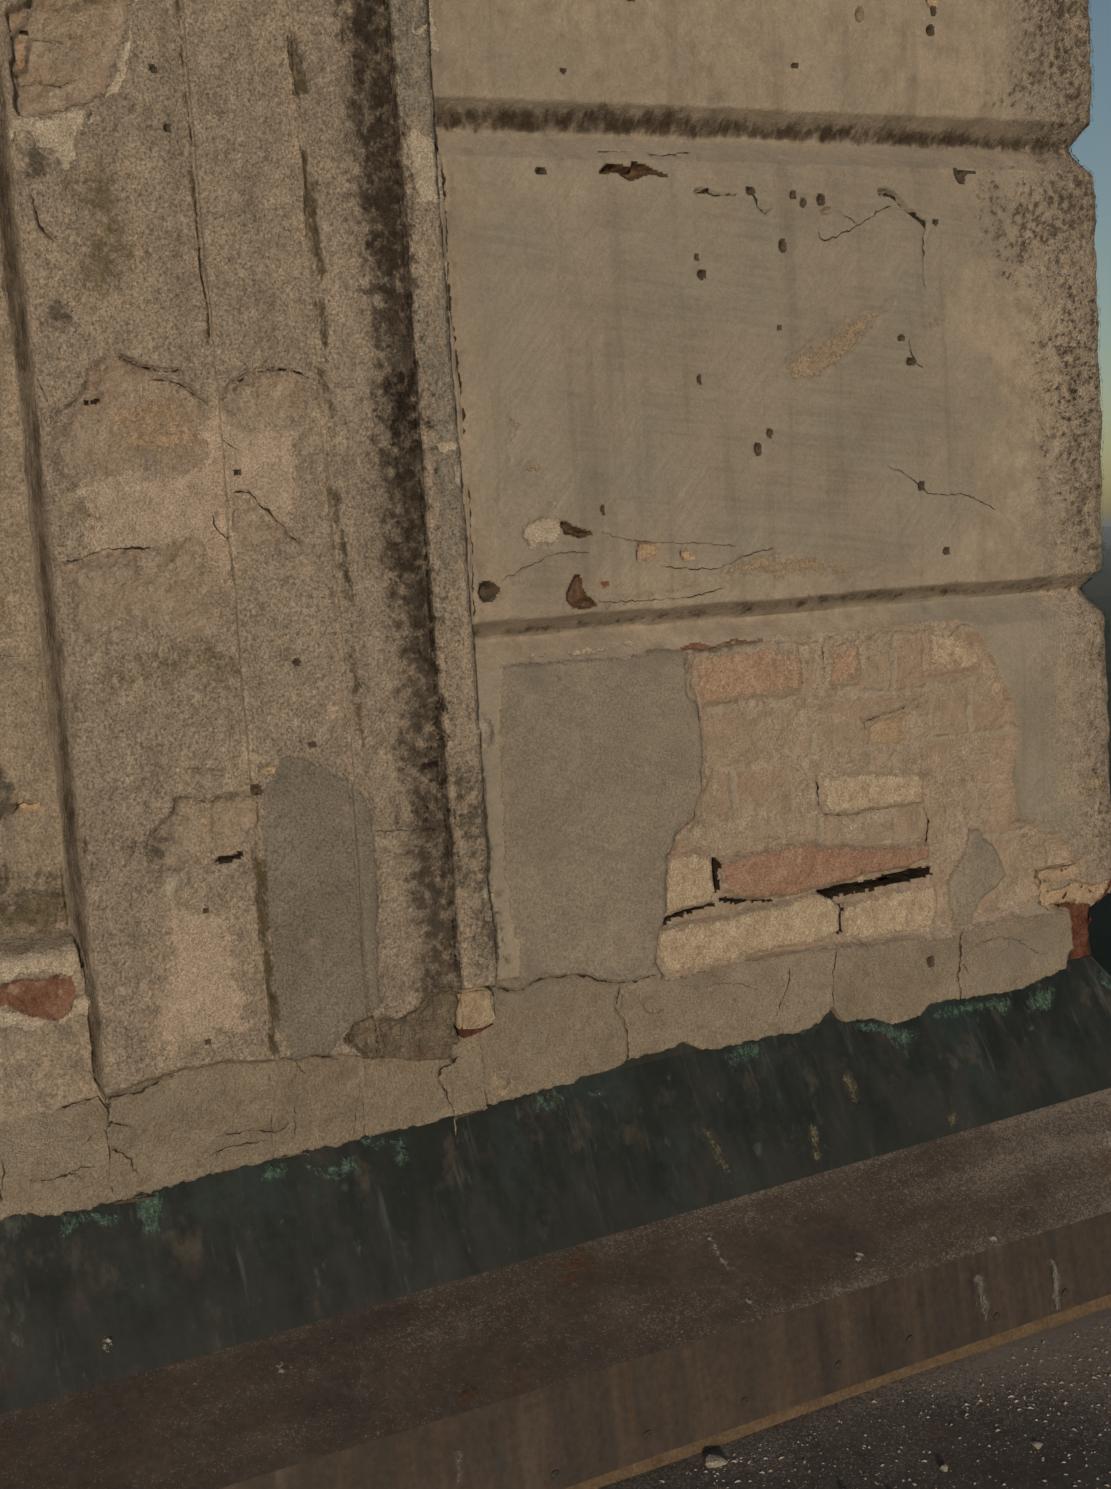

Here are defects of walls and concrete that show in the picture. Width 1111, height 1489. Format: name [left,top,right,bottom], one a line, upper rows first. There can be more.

spalling [2,0,142,171]
leakage [286,33,308,93]
leakage [299,146,326,278]
leakage [337,0,429,330]
crack [819,193,927,289]
peeling [51,350,318,652]
leakage [373,360,448,675]
spalling [656,619,1111,981]
peeling [0,943,92,1033]
crack [500,974,663,1060]
crack [210,1108,296,1173]
crack [438,1056,458,1113]